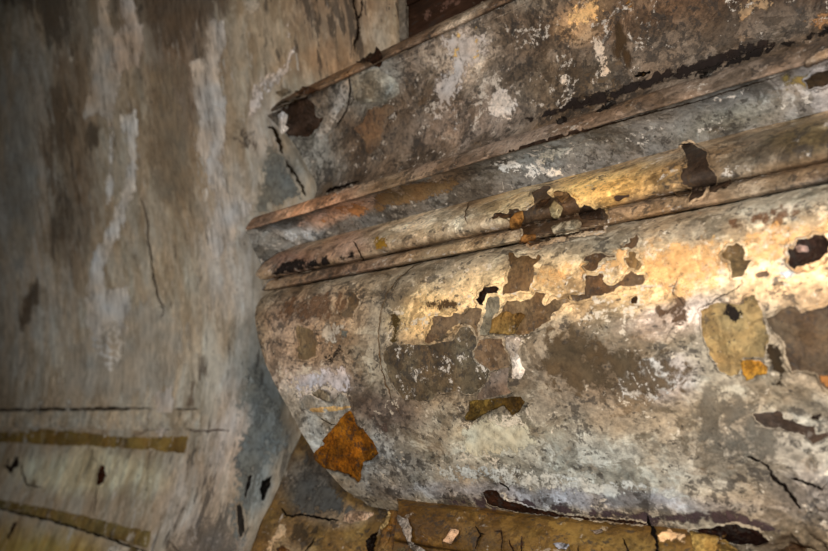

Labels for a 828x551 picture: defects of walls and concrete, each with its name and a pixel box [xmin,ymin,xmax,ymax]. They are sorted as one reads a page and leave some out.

crack [352,0,363,51]
crack [336,71,354,128]
damp [2,0,301,413]
crack [141,199,164,318]
peeling [718,240,771,281]
spalling [783,231,828,274]
peeling [382,184,649,421]
damp [723,303,743,323]
peeling [698,291,828,394]
damp [764,344,787,386]
peeling [751,409,828,446]
crack [647,516,659,551]